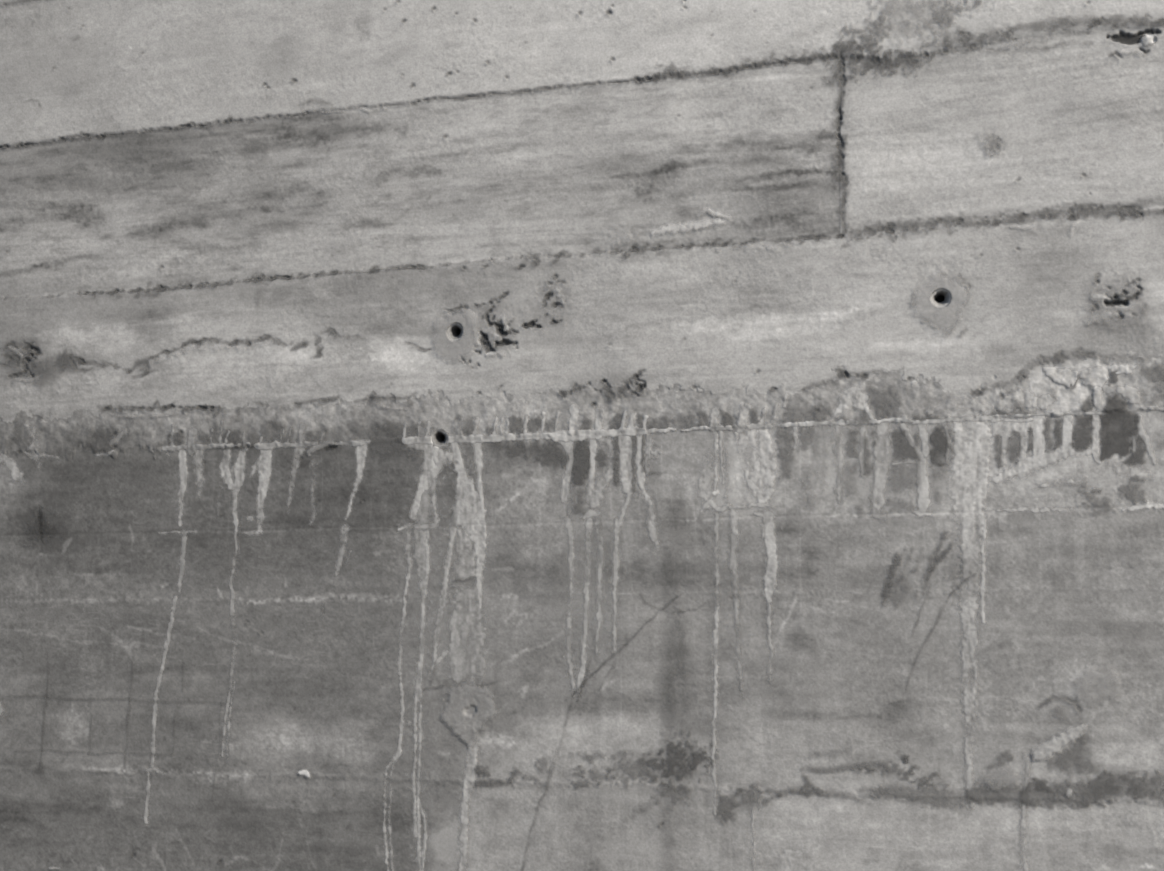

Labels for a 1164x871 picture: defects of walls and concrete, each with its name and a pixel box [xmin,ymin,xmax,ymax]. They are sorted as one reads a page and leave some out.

spalling [1107,30,1159,57]
spalling [1092,275,1142,323]
damp [143,364,1164,871]